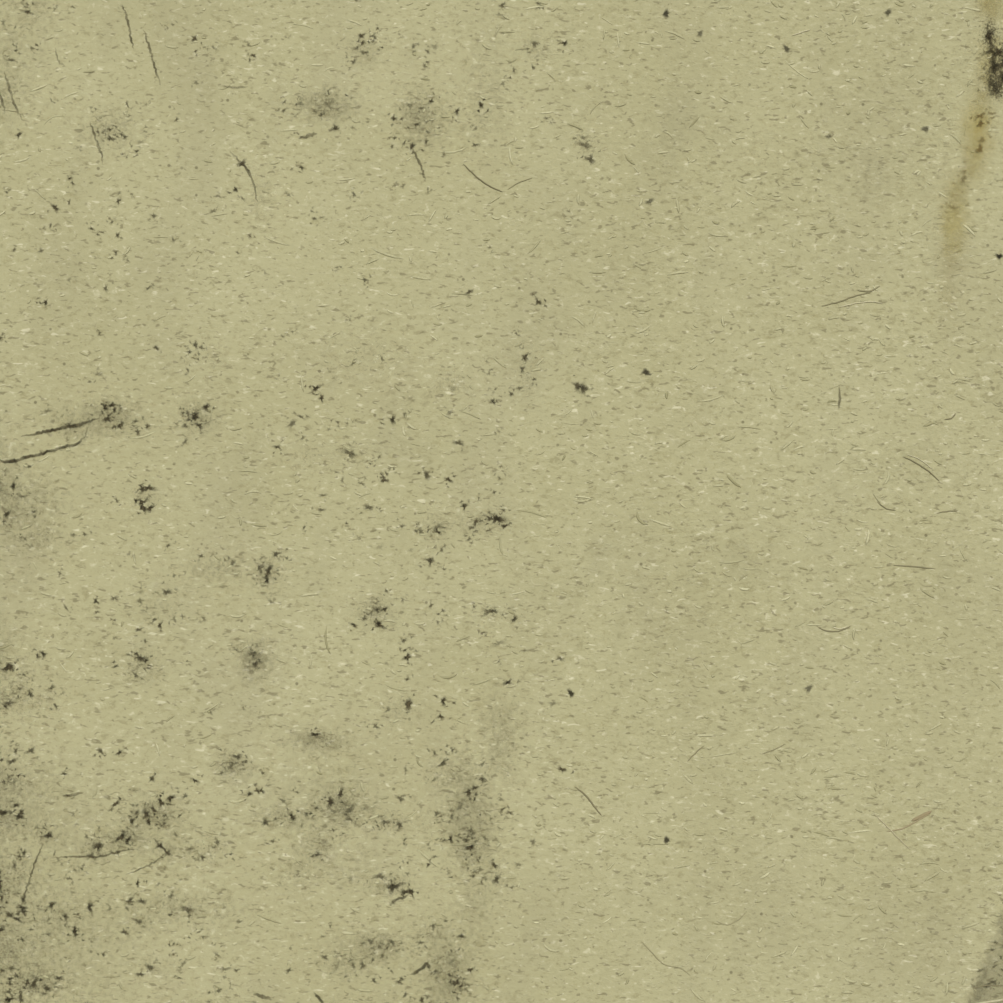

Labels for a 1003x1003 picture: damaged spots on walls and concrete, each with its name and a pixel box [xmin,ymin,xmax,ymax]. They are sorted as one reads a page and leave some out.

rust [985,25,1003,99]